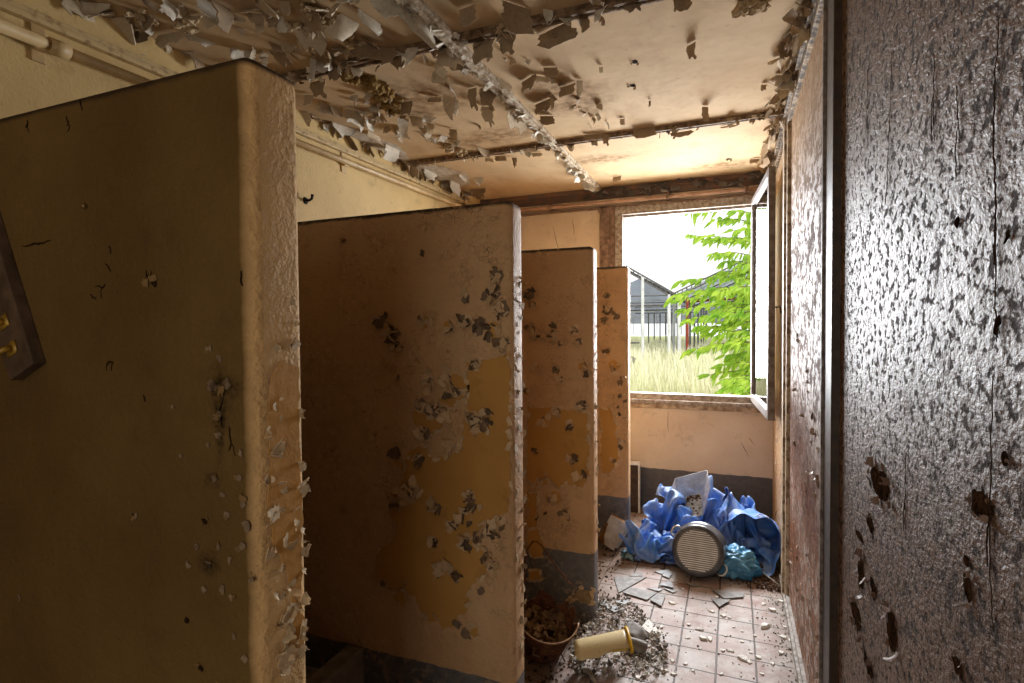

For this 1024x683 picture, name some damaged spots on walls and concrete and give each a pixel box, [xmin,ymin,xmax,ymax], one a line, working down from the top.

peeling [61,0,813,266]
crack [991,17,999,342]
peeling [264,297,311,676]
peeling [370,266,627,657]
hole [845,456,899,683]
hole [948,656,962,682]
hole [958,551,975,609]
hole [965,486,989,523]